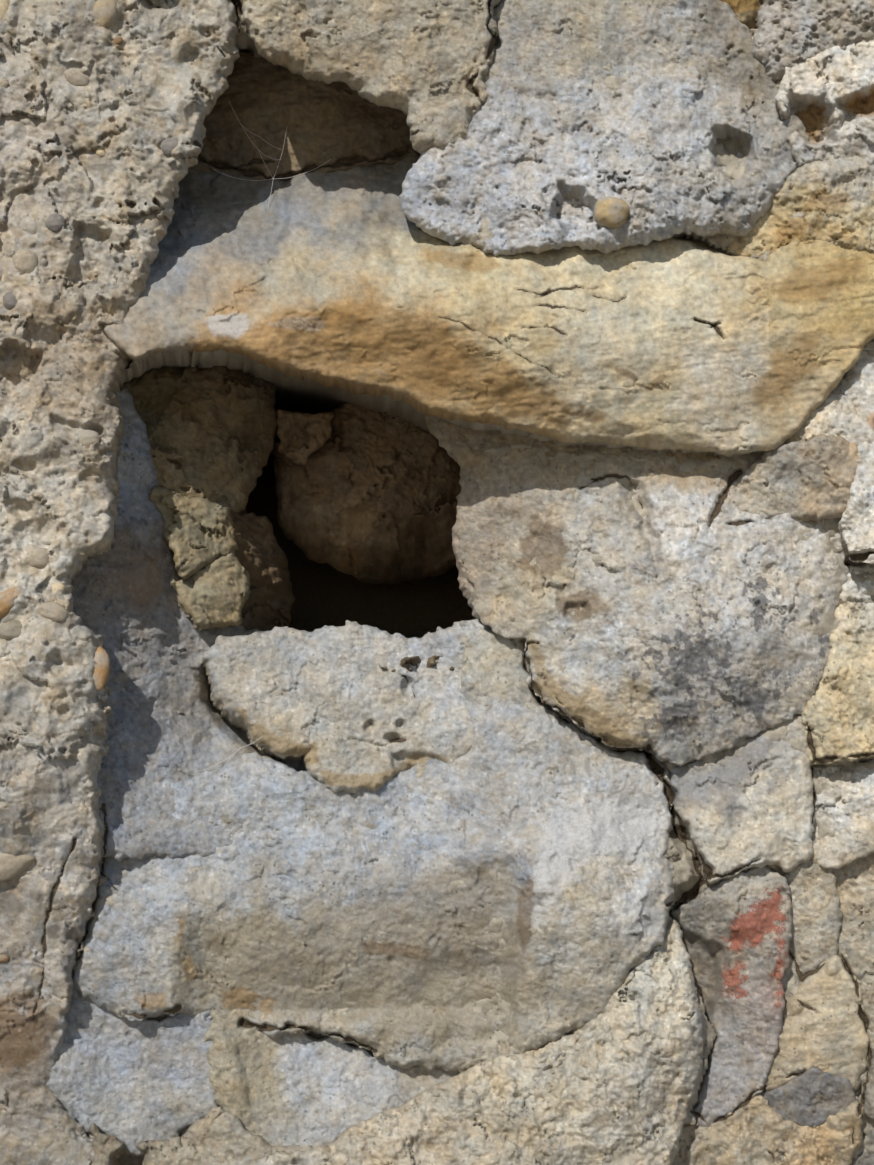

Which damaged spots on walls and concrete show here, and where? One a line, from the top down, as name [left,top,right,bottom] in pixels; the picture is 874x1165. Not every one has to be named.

crack [232,0,249,33]
crack [466,32,498,98]
crack [709,470,771,527]
crack [36,803,118,1006]
crack [127,1005,181,1021]
crack [239,1019,377,1053]